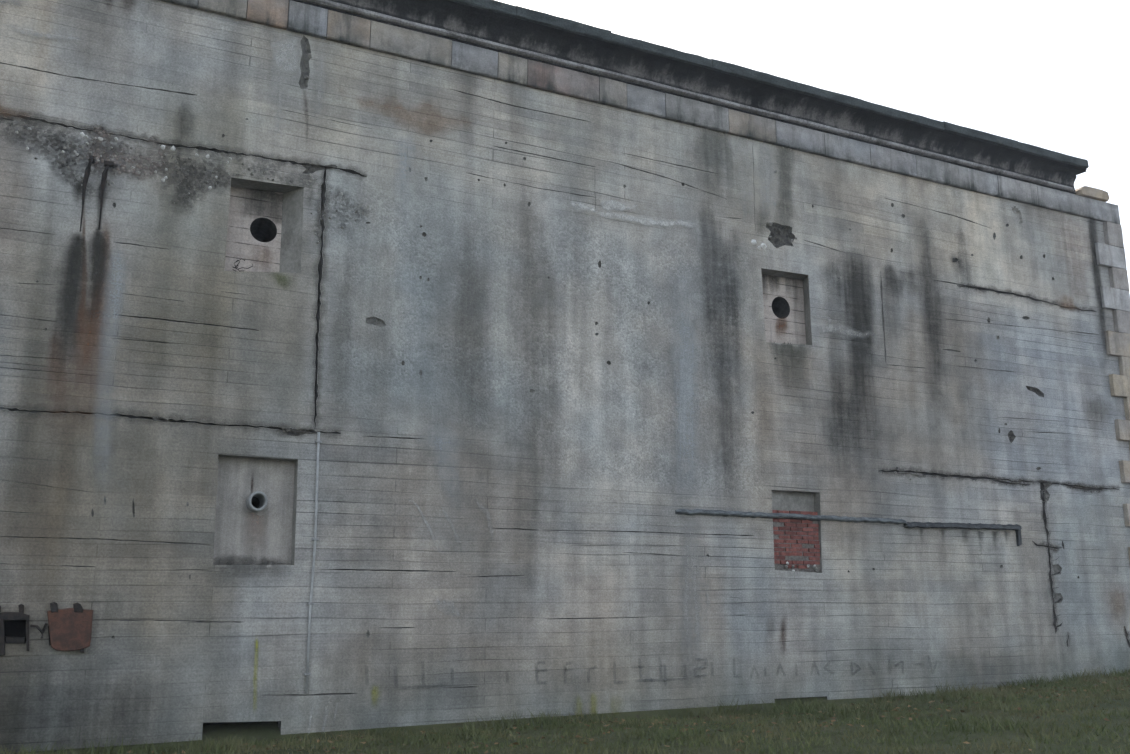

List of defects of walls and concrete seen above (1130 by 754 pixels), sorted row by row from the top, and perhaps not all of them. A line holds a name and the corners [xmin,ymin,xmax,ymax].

spalling [0,118,338,204]
rust [75,227,109,365]
crack [0,110,367,435]
spalling [751,222,797,249]
water stain [845,260,872,427]
crack [957,285,1096,312]
crack [878,468,1120,646]